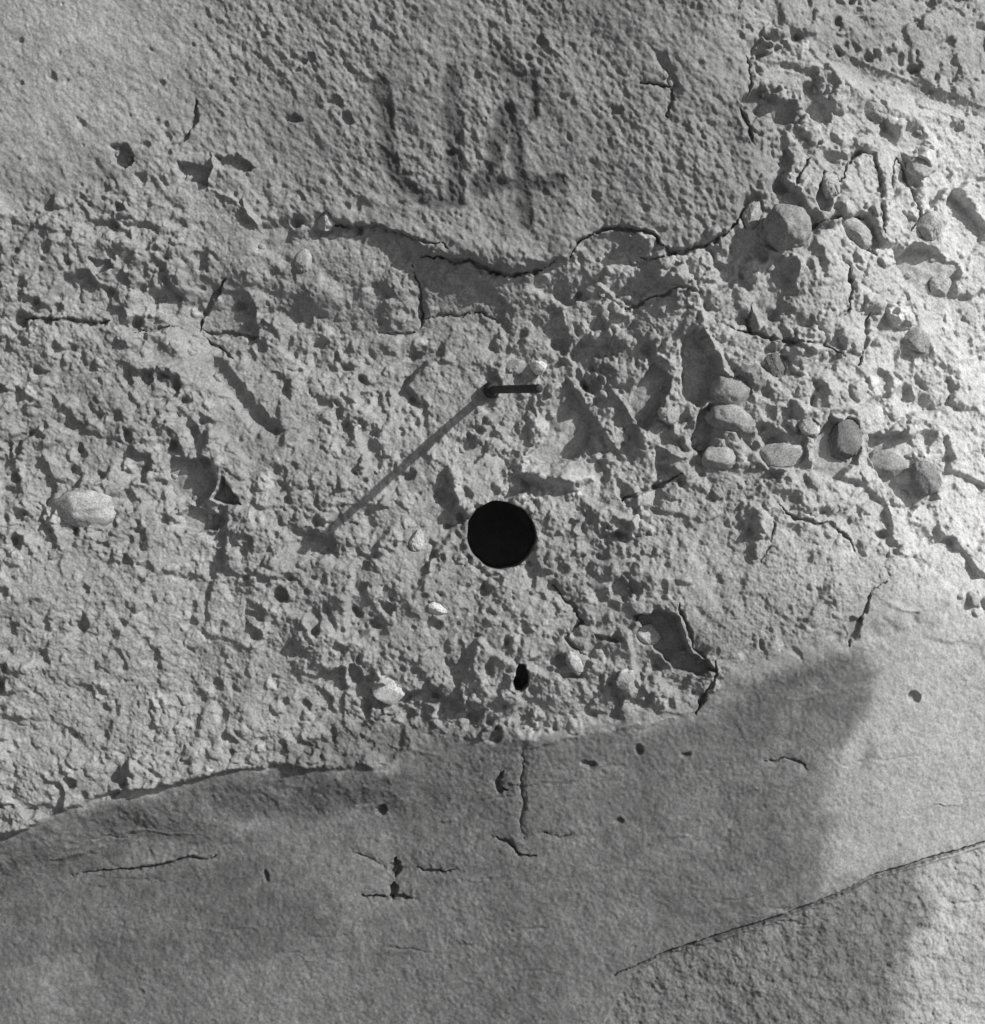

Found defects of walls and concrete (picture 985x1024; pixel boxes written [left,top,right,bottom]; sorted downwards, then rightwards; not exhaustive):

crack [336,219,740,337]
spalling [252,40,985,569]
spalling [137,335,289,439]
spalling [164,457,242,533]
spalling [269,587,290,604]
spalling [633,609,715,679]
crack [845,581,888,647]
spalling [346,663,405,705]
crack [496,781,563,857]
crack [83,855,216,874]
crack [358,853,453,899]
crack [616,841,985,975]